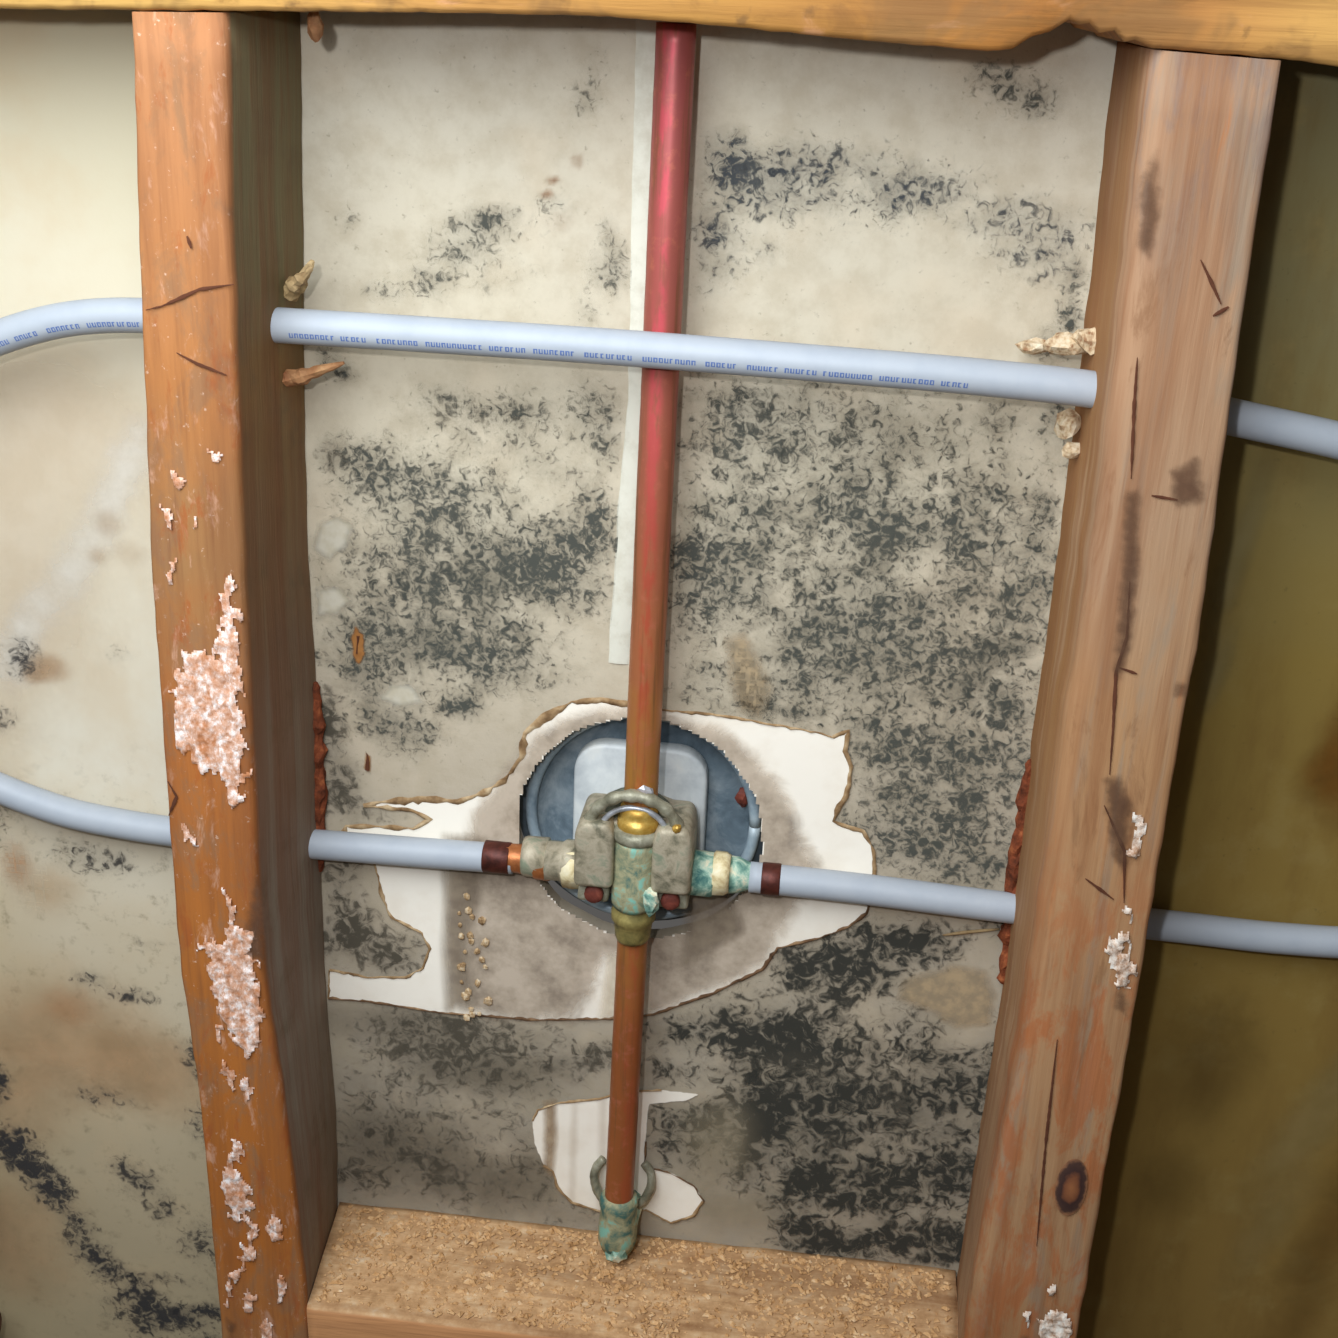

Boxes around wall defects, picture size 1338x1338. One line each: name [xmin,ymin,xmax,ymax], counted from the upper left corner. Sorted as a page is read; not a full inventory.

crack [146,284,234,310]
crack [177,353,227,376]
leakage [315,434,618,819]
leakage [668,373,1059,887]
peeling [341,697,628,841]
leakage [465,712,627,844]
peeling [662,639,877,875]
peeling [327,864,617,1021]
leakage [369,870,617,1129]
peeling [643,898,870,1017]
peeling [532,1095,610,1213]
leakage [642,890,994,1268]